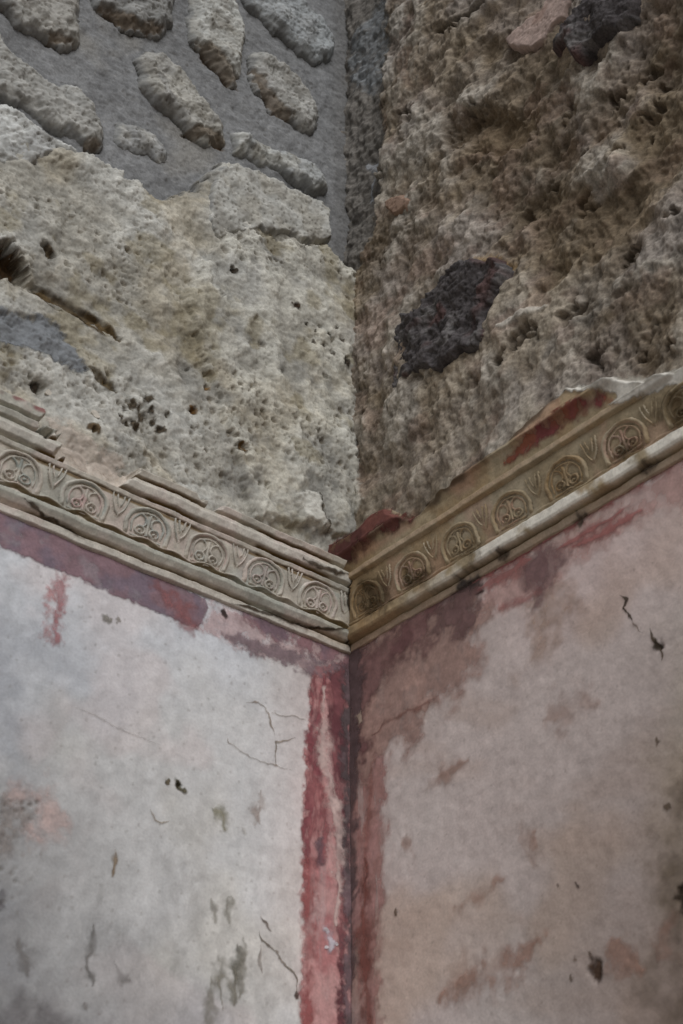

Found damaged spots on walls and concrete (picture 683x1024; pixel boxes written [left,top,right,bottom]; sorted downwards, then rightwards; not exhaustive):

crack [622,596,663,658]
crack [246,701,295,766]
damp [338,587,491,1024]
crack [259,919,299,999]
spalling [588,952,602,982]